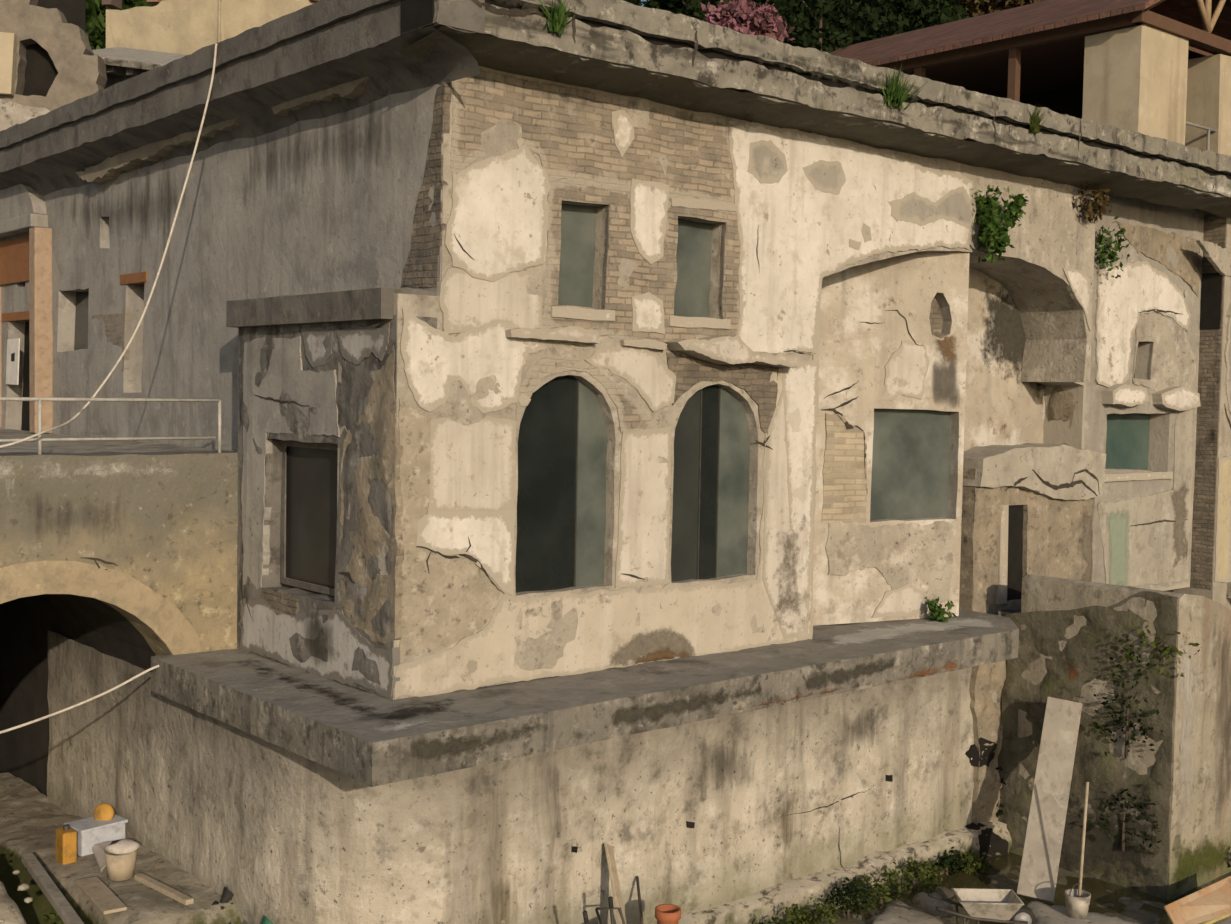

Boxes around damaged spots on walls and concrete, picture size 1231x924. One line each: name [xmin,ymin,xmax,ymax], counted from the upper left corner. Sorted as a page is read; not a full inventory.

crack [472,0,576,43]
crack [691,30,699,67]
peeling [1062,221,1231,392]
peeling [239,77,976,697]
crack [416,536,504,594]
damp [806,659,894,690]
damp [244,660,453,733]
damp [614,687,761,725]
damp [412,725,530,759]